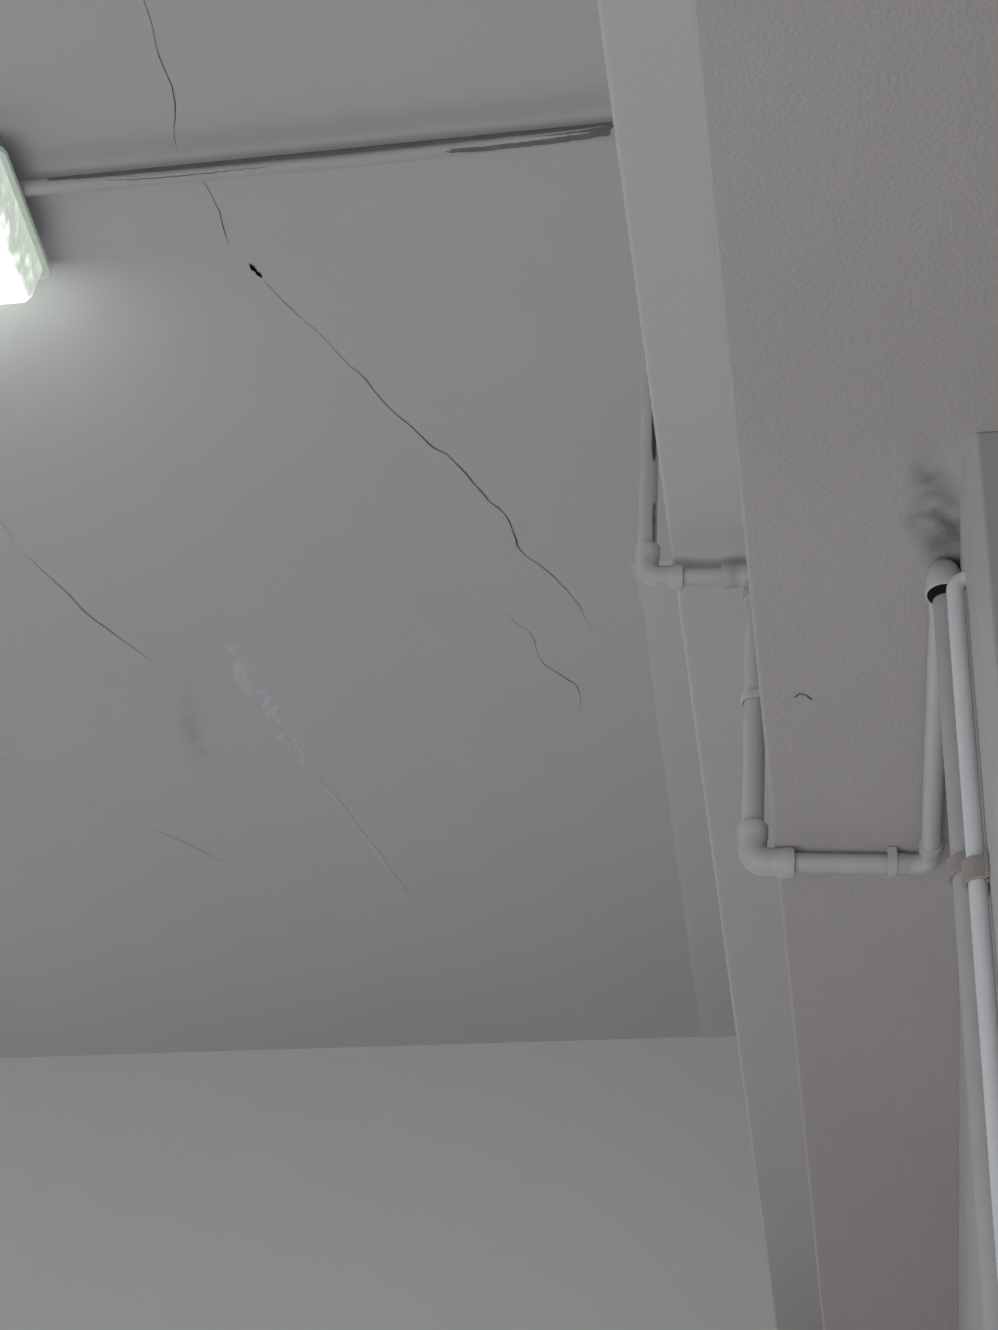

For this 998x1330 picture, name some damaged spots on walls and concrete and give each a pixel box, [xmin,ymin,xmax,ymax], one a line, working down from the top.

crack [144,1,177,148]
crack [264,282,587,622]
crack [0,521,153,663]
crack [507,612,581,705]